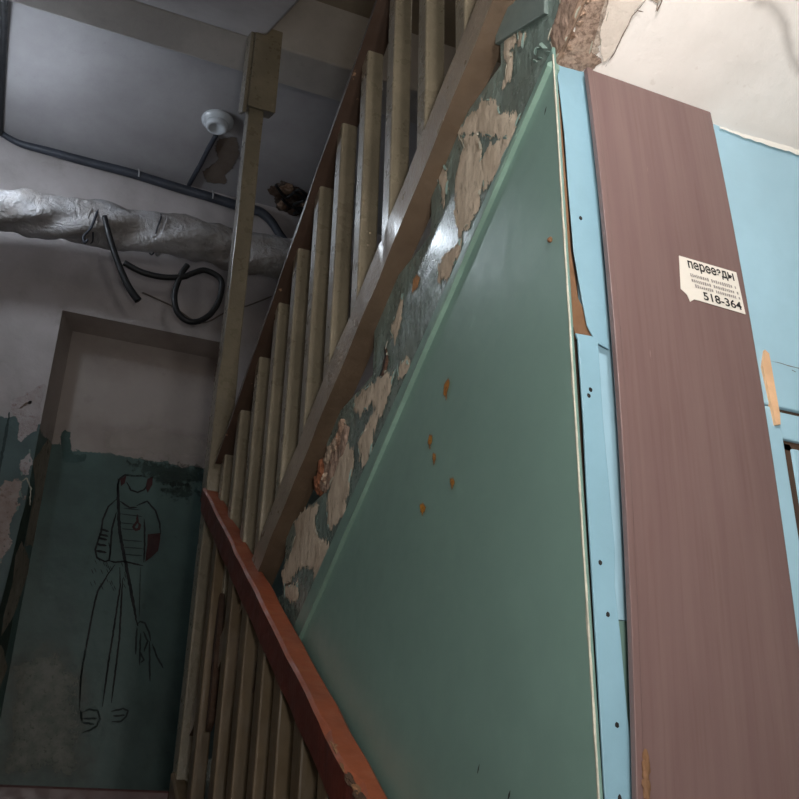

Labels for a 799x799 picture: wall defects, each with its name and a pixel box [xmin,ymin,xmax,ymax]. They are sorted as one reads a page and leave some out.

peeling [502,29,527,91]
spalling [533,0,660,71]
peeling [437,97,521,283]
peeling [0,449,33,563]
peeling [10,384,45,442]
peeling [281,294,411,604]